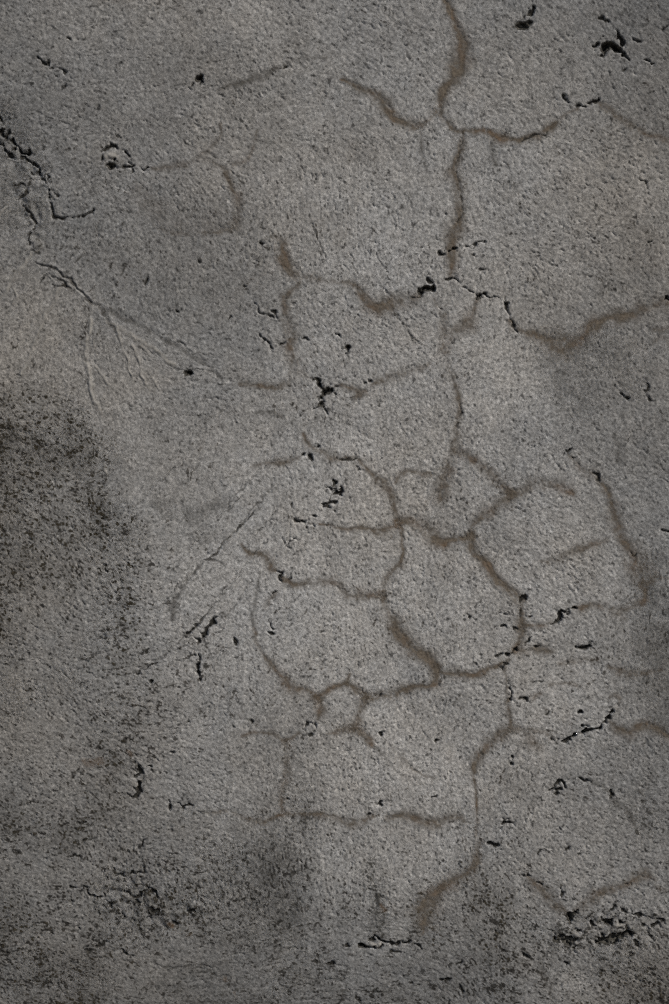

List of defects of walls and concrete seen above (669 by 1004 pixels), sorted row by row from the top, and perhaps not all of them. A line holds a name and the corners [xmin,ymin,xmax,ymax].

crack [340,79,422,149]
crack [438,0,669,354]
crack [41,265,115,330]
crack [278,244,293,307]
crack [352,283,441,313]
crack [241,544,307,587]
crack [255,434,600,746]
crack [593,472,647,606]
crack [534,709,669,744]
crack [349,699,513,827]
crack [417,850,480,934]
crack [523,874,639,923]